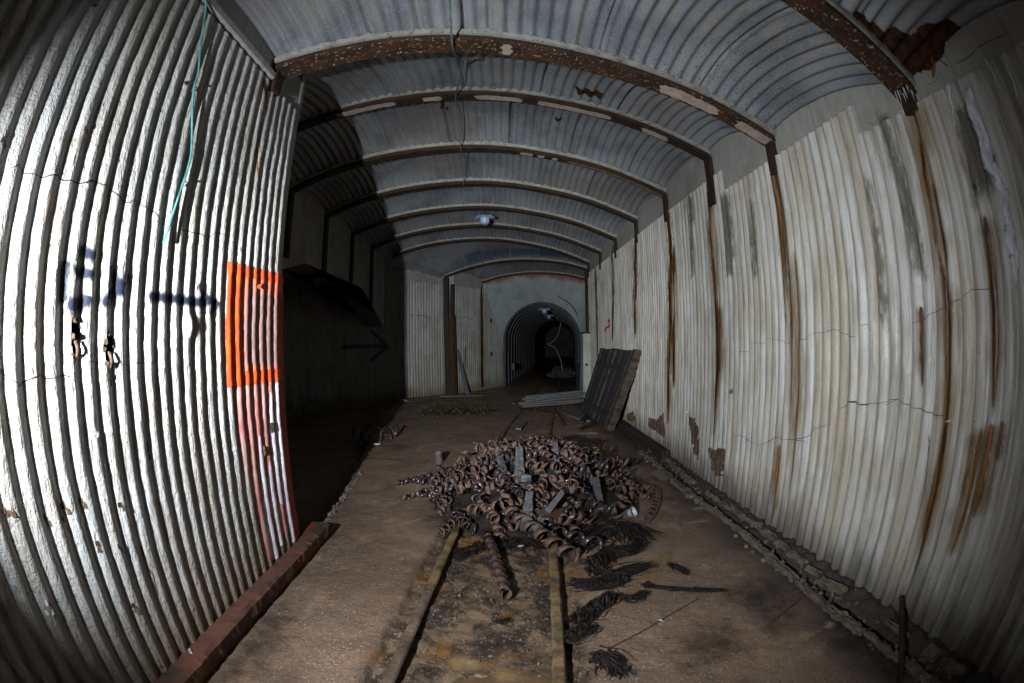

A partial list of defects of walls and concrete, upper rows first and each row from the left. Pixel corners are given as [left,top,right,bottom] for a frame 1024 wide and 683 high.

rust [575,86,603,99]
rust [853,11,961,77]
water stain [880,117,924,271]
rust [771,175,799,514]
water stain [873,221,888,317]
rust [913,111,951,568]
rust [982,216,999,406]
spalling [648,413,665,438]
spalling [686,410,725,476]
crack [741,399,951,506]
rust [951,422,1003,553]